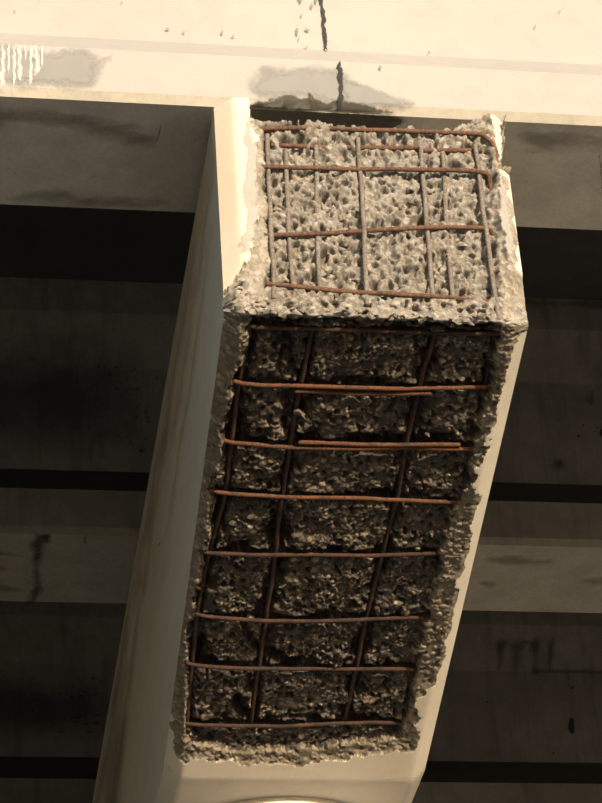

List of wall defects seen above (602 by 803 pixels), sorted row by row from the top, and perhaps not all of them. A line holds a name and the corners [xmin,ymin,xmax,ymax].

damp [0,46,96,85]
crack [320,0,344,110]
spalling [169,68,528,767]